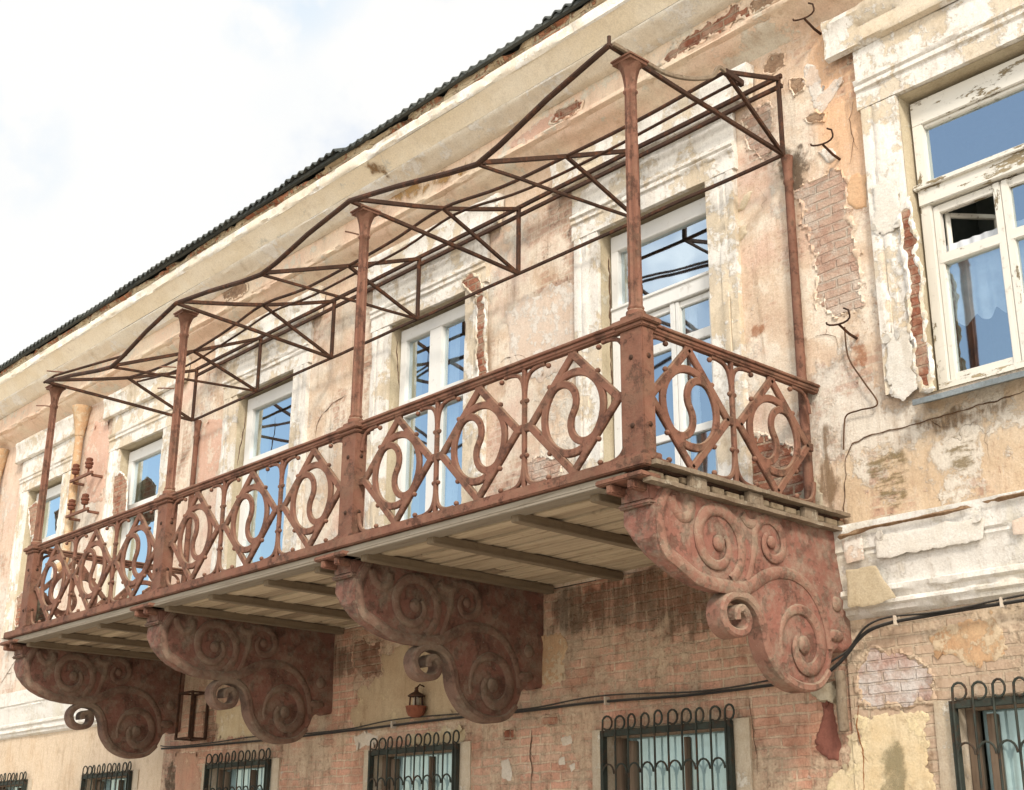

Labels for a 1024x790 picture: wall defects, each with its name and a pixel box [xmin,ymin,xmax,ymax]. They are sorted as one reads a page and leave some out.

flaking render [655,0,779,67]
peeling [511,98,584,147]
peeling [788,64,844,124]
peeling [794,148,935,401]
flaking render [461,272,488,377]
leakage [868,452,907,505]
peeling [837,491,1024,608]
peeling [853,644,942,711]